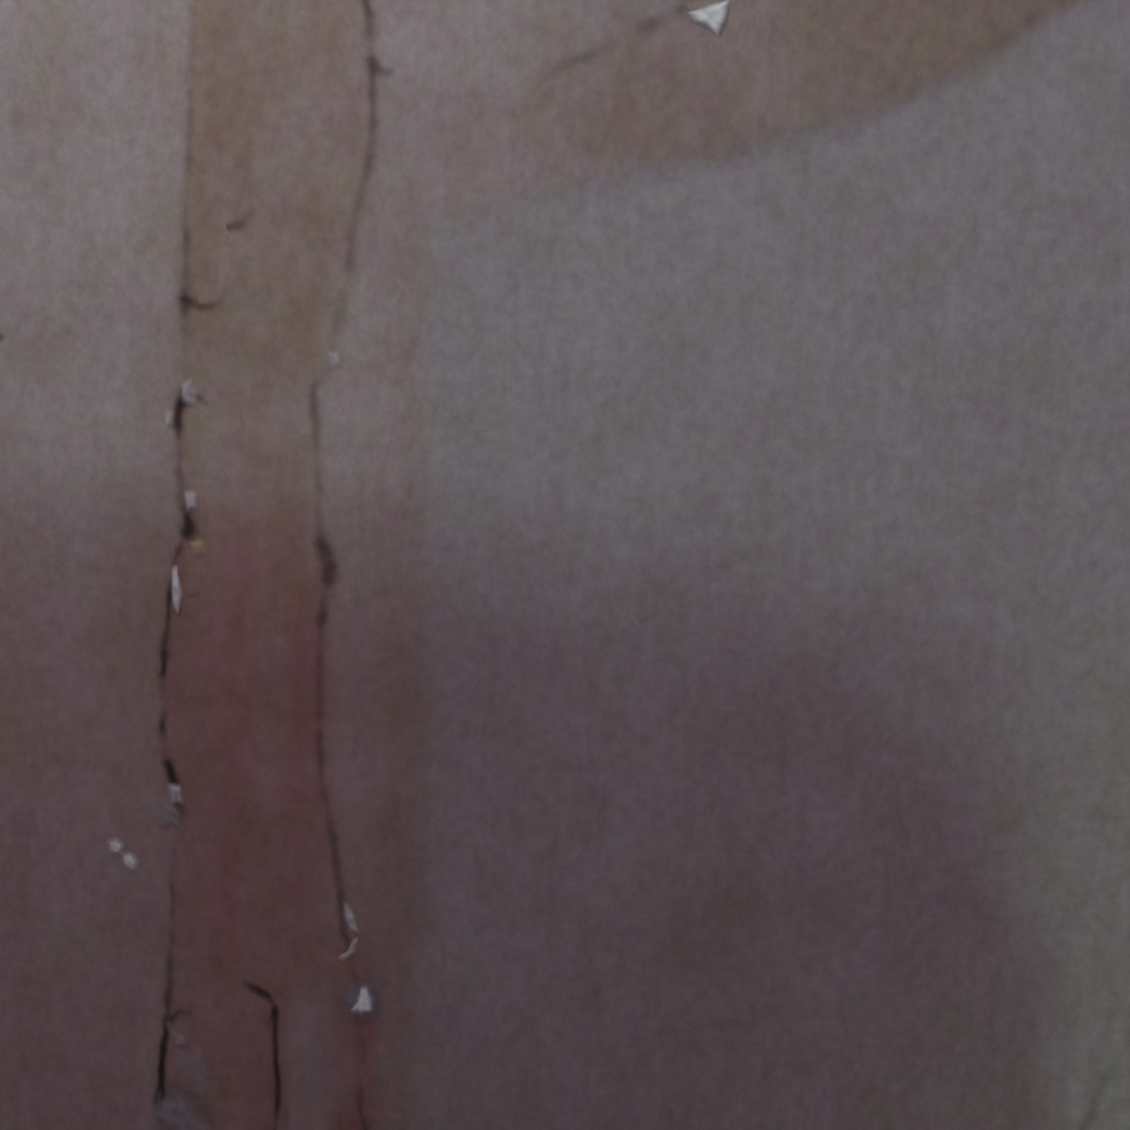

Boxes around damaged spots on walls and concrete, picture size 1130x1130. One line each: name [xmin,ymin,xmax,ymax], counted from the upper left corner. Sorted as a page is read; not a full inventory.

flaking render [692,1,728,33]
crack [166,388,189,428]
crack [182,514,194,538]
crack [320,544,333,582]
crack [167,570,180,619]
crack [159,649,167,675]
crack [164,760,178,798]
crack [156,1016,185,1102]
crack [249,984,279,1114]